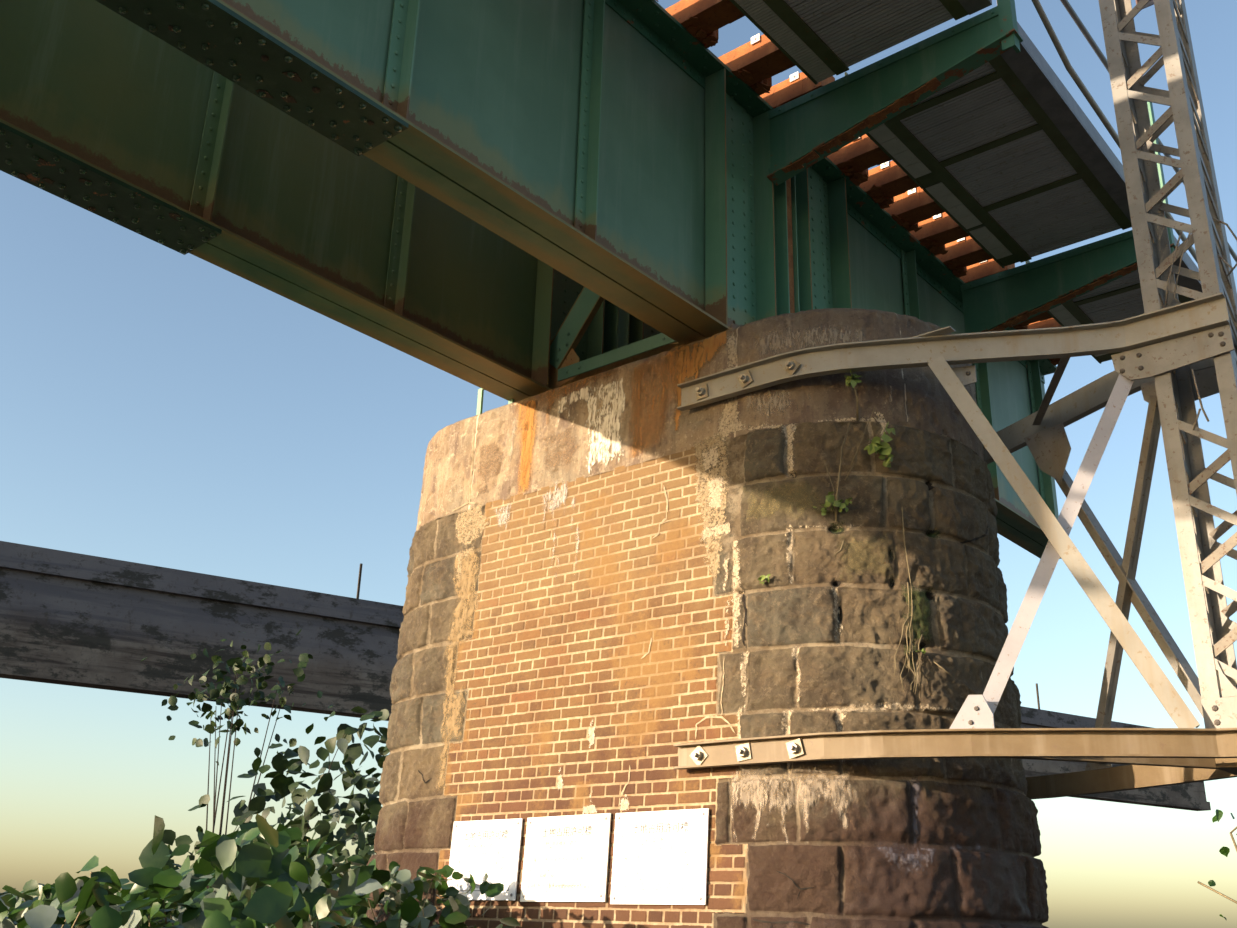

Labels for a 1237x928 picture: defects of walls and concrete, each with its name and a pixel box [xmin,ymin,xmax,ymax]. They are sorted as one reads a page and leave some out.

rust [781,77,941,173]
rust [518,369,616,491]
efflorescence [558,378,625,473]
rust [665,329,730,431]
leakage [729,766,852,842]
leakage [822,781,1031,928]